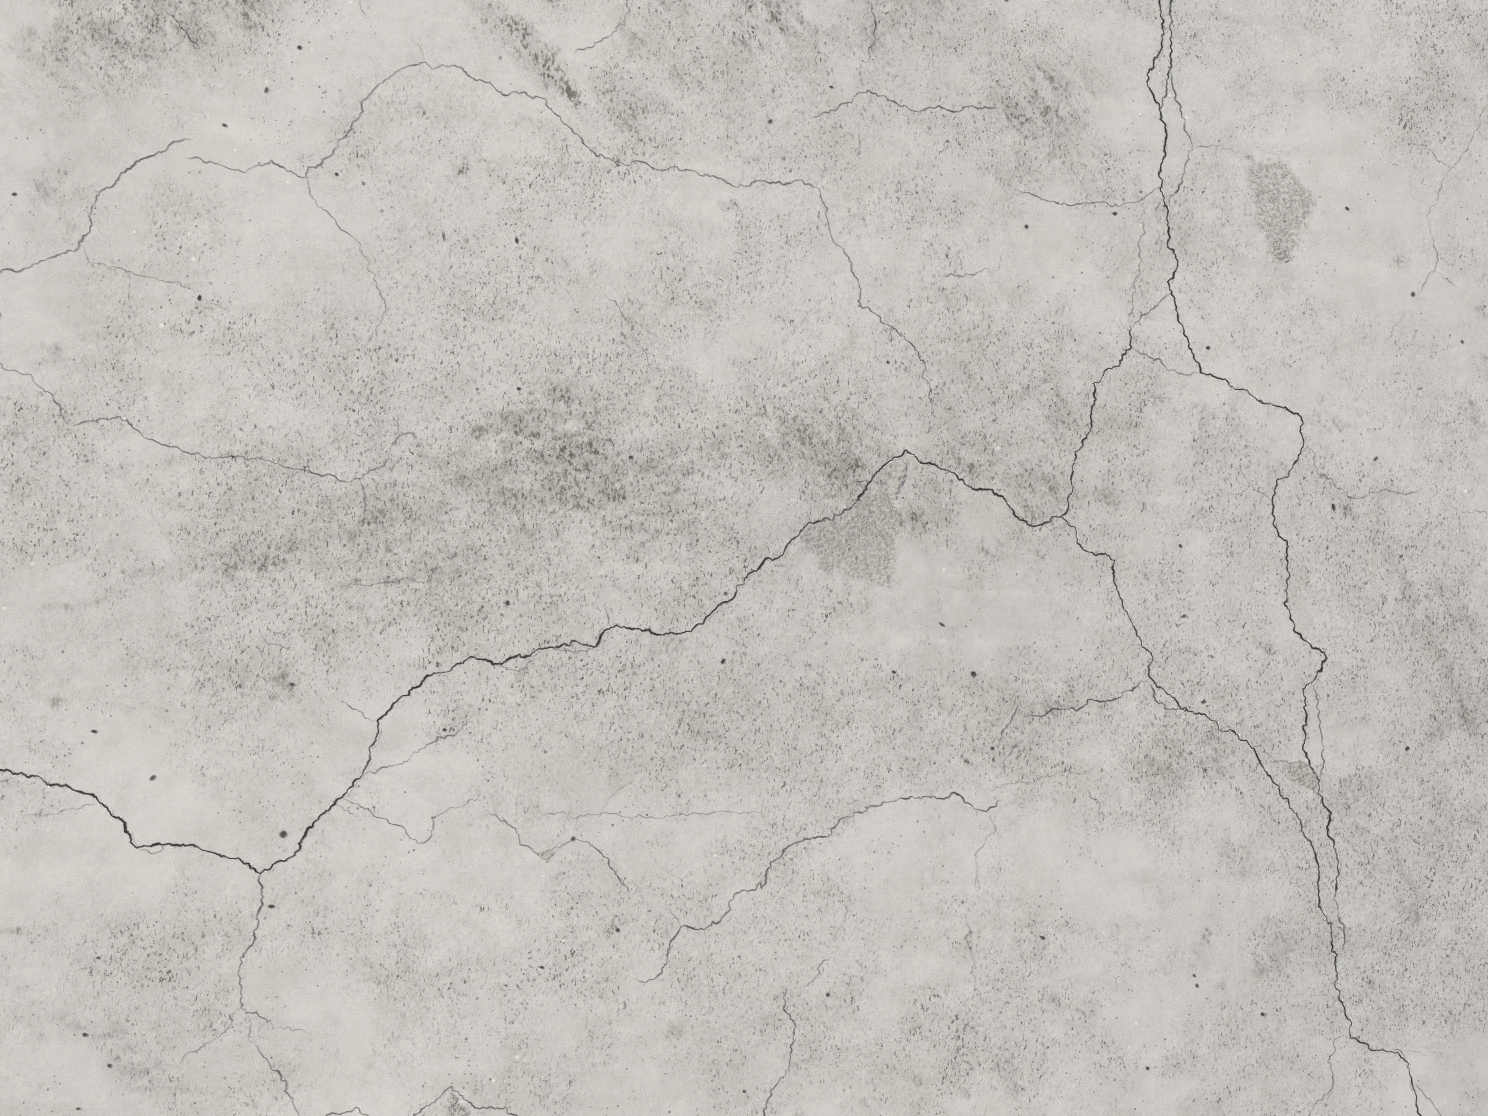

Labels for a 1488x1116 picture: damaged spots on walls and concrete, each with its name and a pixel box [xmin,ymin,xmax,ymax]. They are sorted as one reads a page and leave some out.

crack [9,143,172,272]
crack [272,61,932,400]
crack [832,90,990,112]
crack [1136,0,1340,896]
crack [0,329,1441,1116]